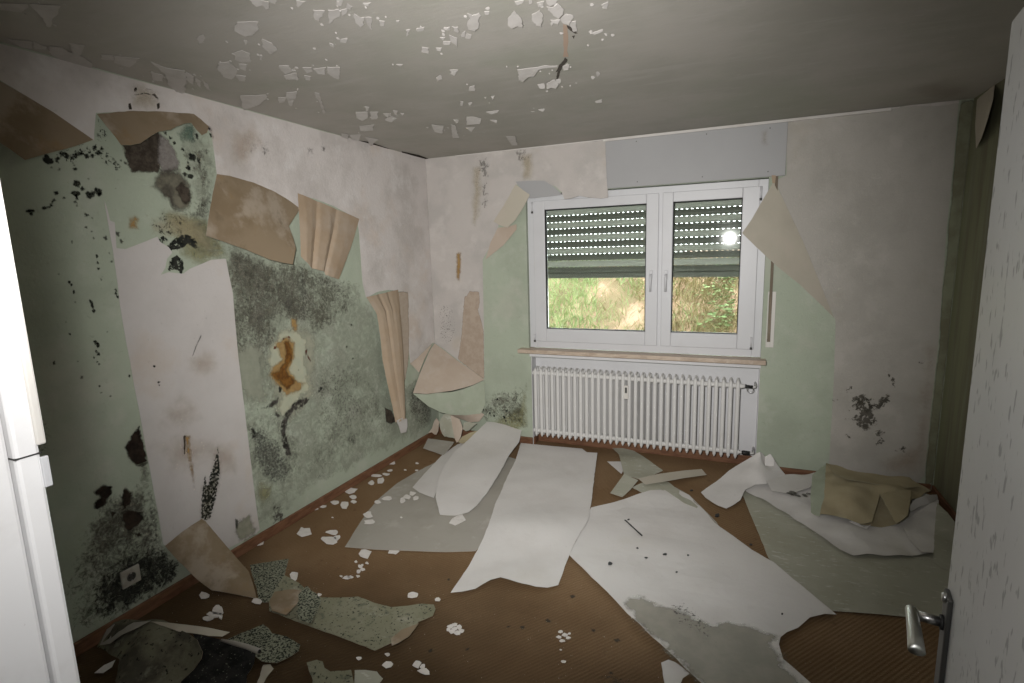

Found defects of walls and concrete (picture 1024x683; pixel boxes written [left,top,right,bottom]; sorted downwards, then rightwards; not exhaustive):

peeling [217,21,277,81]
peeling [240,59,340,113]
peeling [290,0,424,48]
peeling [421,7,490,55]
peeling [426,84,499,138]
peeling [506,0,614,92]
damp [26,120,349,358]
damp [125,426,148,473]
damp [201,449,220,520]
damp [251,372,361,497]
damp [846,374,895,445]
damp [75,485,178,624]